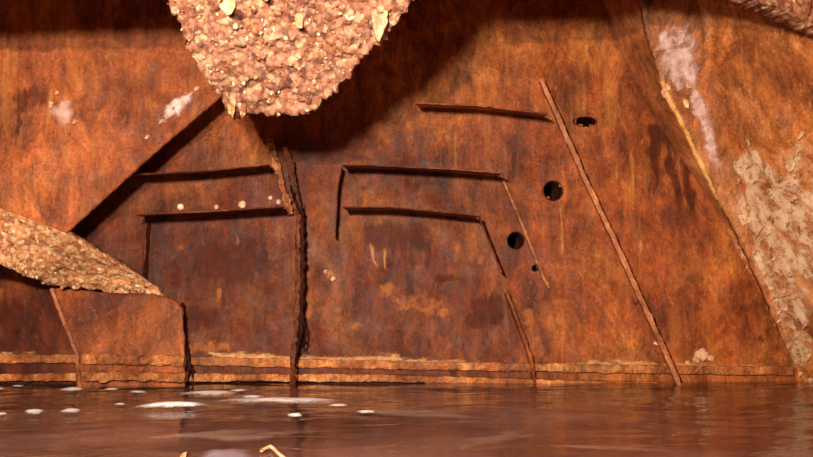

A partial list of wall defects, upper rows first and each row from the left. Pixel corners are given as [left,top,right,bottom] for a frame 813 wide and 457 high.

damp [16,87,44,133]
crack [290,186,307,368]
peeling [733,131,813,382]
damp [209,352,465,362]
rust [685,348,714,365]